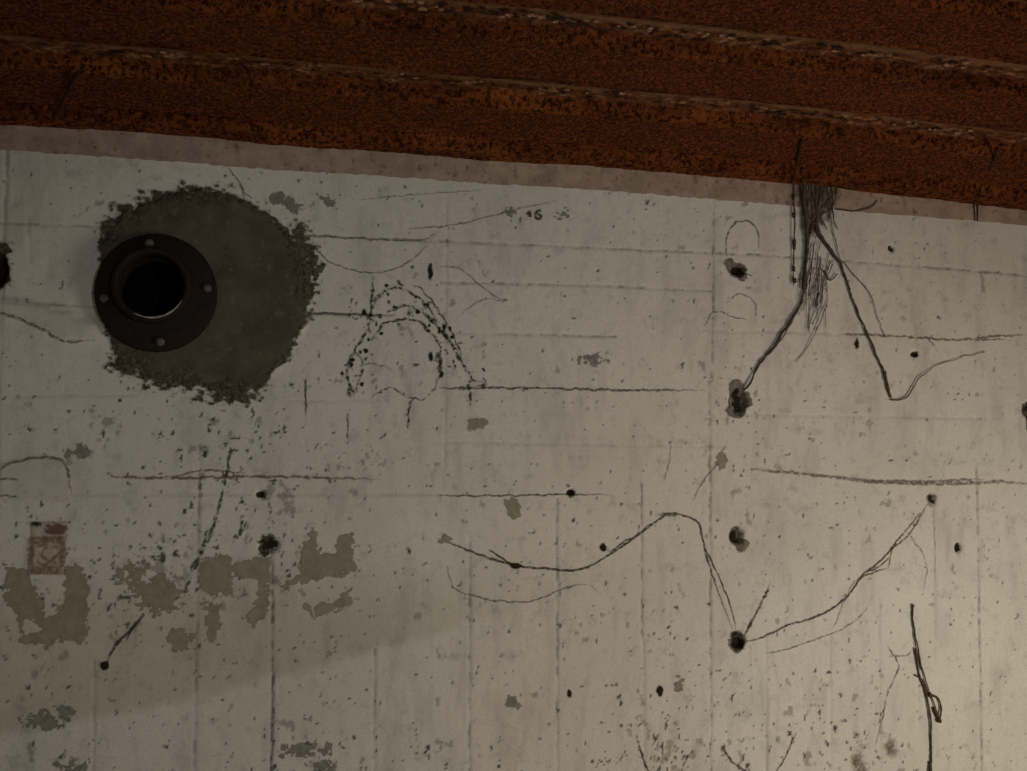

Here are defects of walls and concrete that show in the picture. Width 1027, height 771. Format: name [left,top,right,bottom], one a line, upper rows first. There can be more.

crack [726,220,759,252]
spalling [0,260,13,288]
crack [307,310,380,318]
crack [846,333,1011,342]
peeling [111,528,359,651]
crack [449,510,925,653]
peeling [3,563,90,650]
crack [879,648,911,733]
peeling [53,756,90,771]
peeling [274,738,338,771]